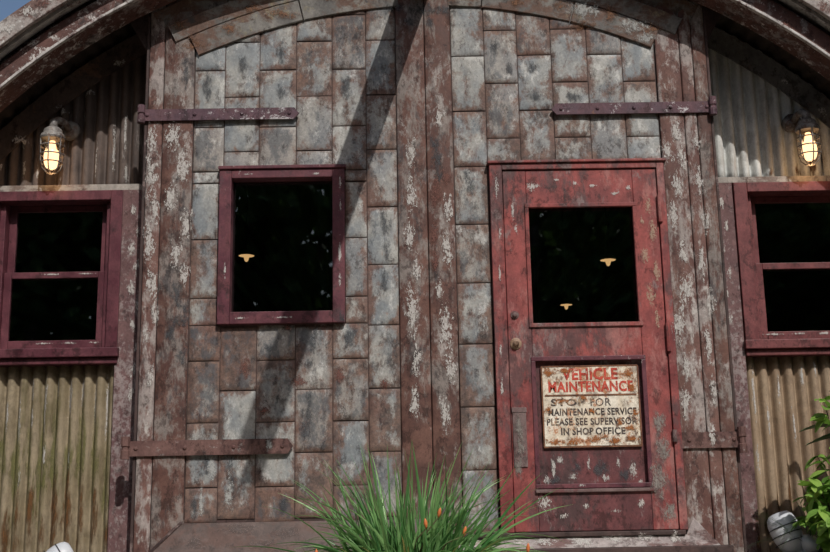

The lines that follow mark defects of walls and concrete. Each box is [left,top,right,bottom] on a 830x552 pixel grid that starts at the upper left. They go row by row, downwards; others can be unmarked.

peeling [128,122,193,352]
peeling [403,137,417,250]
peeling [404,259,424,418]
peeling [436,277,458,385]
peeling [441,193,454,269]
peeling [640,198,661,327]
peeling [671,275,694,421]
peeling [659,122,707,227]
peeling [698,247,717,364]
peeling [438,395,451,435]
spalling [650,411,676,522]
peeling [512,532,654,546]